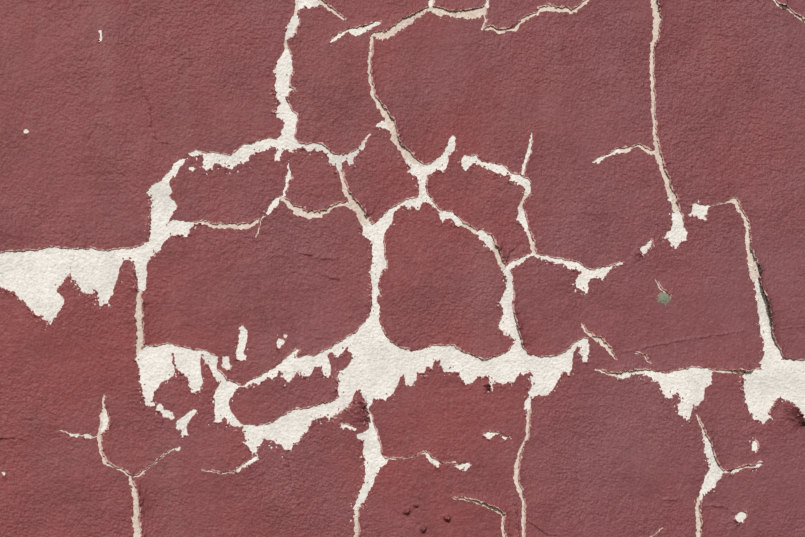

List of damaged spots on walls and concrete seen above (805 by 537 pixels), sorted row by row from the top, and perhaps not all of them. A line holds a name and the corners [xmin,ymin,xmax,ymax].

crack [773,0,805,22]
crack [330,0,589,167]
crack [592,0,688,249]
crack [255,160,354,238]
peeling [0,0,623,537]
crack [581,323,616,359]
crack [635,351,650,363]
peeling [595,198,805,537]
crack [59,395,181,537]
crack [385,452,471,472]
crack [453,410,532,537]